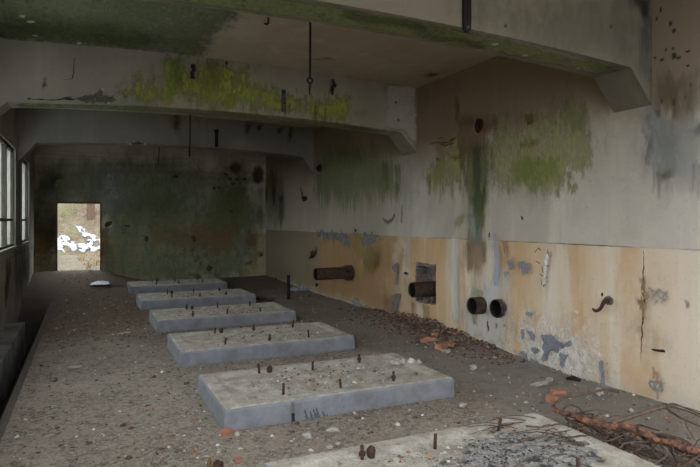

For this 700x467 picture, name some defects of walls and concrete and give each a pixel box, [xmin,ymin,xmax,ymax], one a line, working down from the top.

damp [635,0,690,61]
damp [455,104,496,273]
peeling [511,311,609,386]
crack [640,251,648,352]